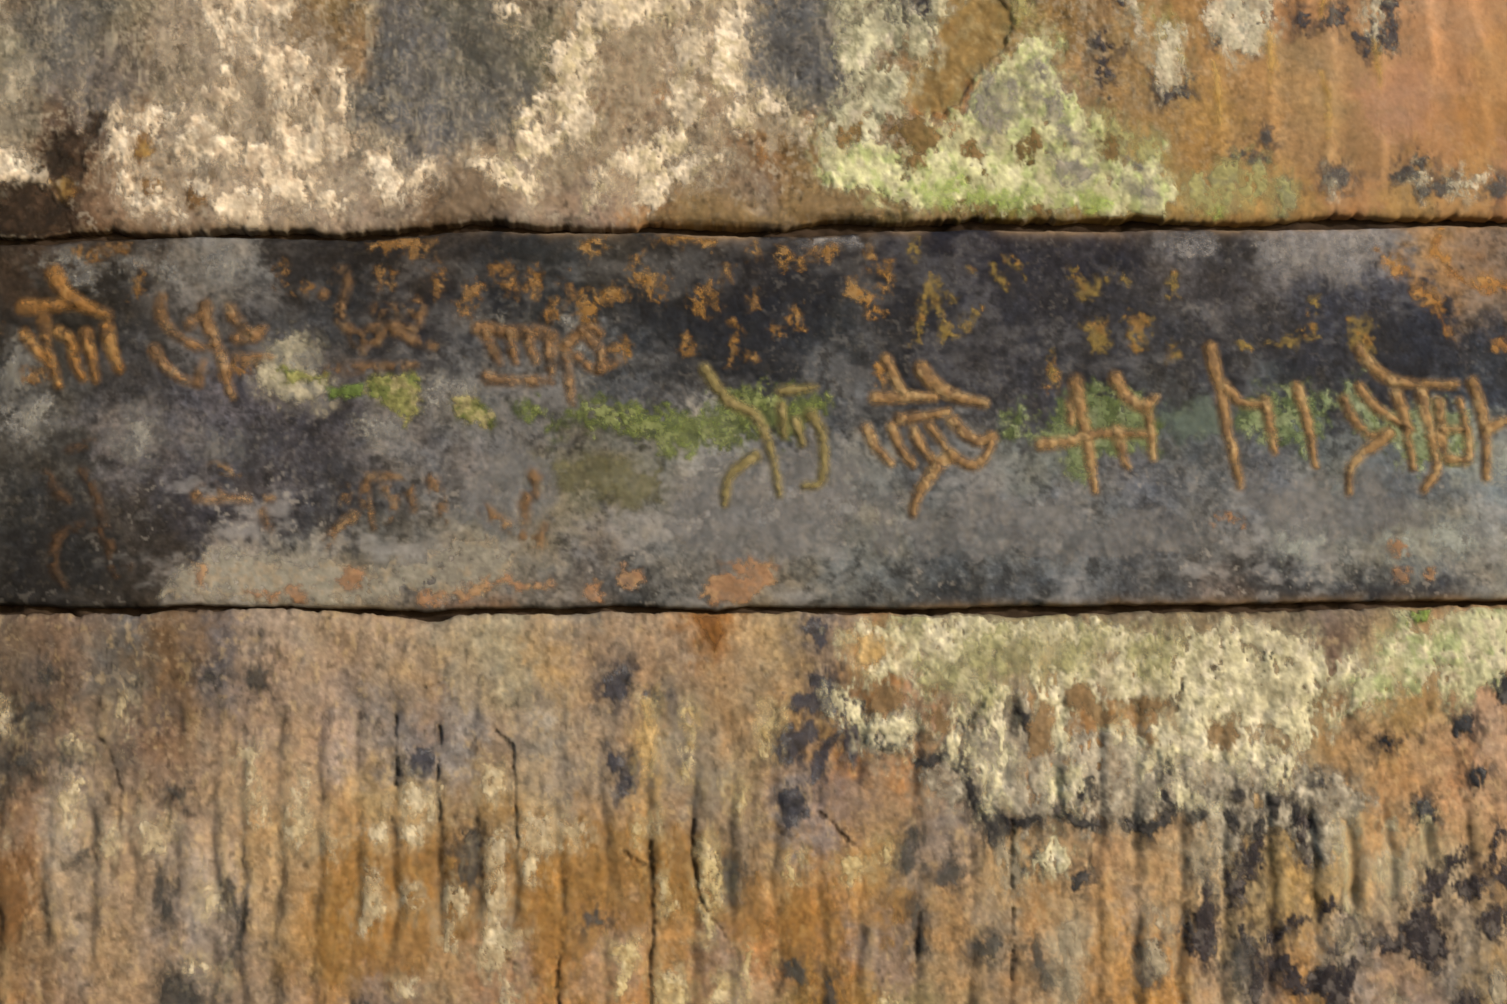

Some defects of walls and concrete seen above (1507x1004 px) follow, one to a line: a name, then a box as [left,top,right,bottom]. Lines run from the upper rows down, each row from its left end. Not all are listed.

water stain [918,0,936,21]
water stain [2,56,36,103]
water stain [104,0,442,228]
water stain [467,0,813,210]
water stain [0,149,48,184]
water stain [256,332,328,400]
water stain [0,394,61,434]
water stain [161,533,513,605]
water stain [857,634,886,666]
water stain [636,698,656,777]